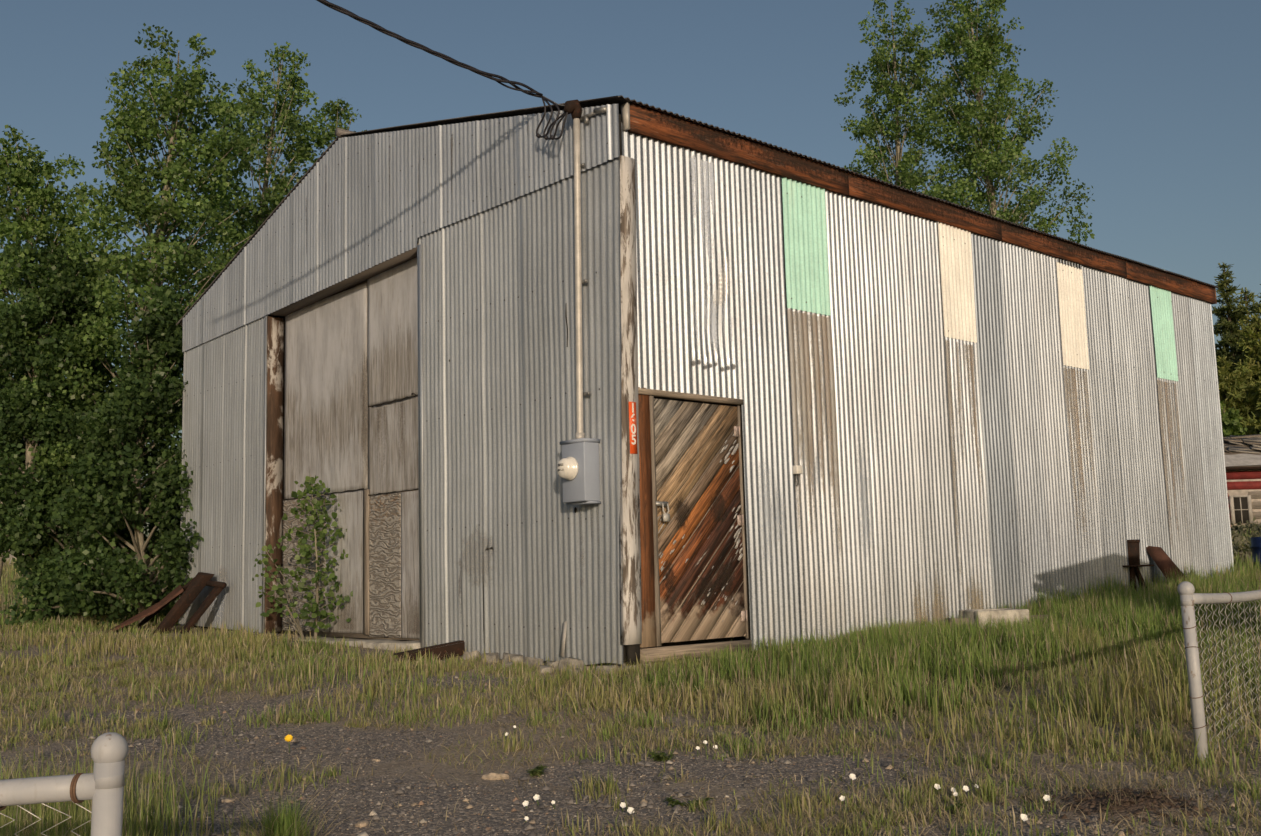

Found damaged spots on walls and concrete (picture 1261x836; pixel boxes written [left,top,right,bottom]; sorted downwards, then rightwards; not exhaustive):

rust [787,310,841,508]
rust [945,340,979,530]
rust [968,581,984,609]